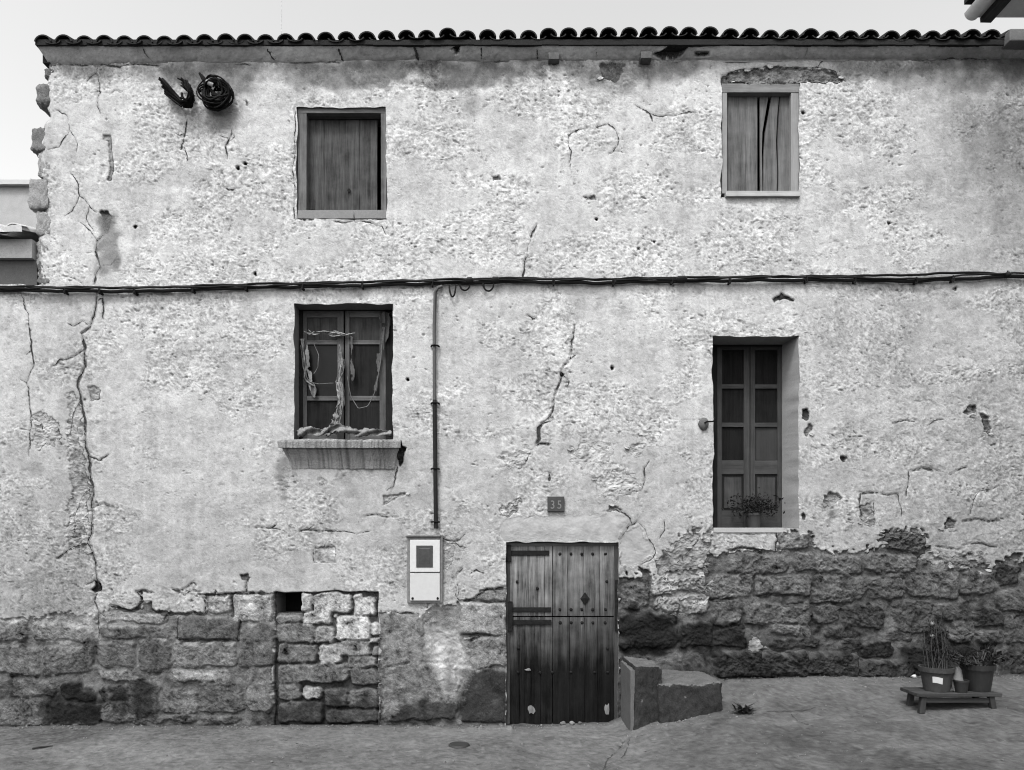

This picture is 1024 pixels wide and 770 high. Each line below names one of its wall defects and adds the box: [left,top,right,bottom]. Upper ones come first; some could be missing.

spalling [721,64,844,84]
crack [568,124,622,172]
damp [98,216,120,273]
crack [20,110,265,643]
crack [522,327,575,466]
spalling [981,413,994,436]
spalling [655,527,715,617]
crack [611,462,778,585]
flaking render [858,503,992,572]